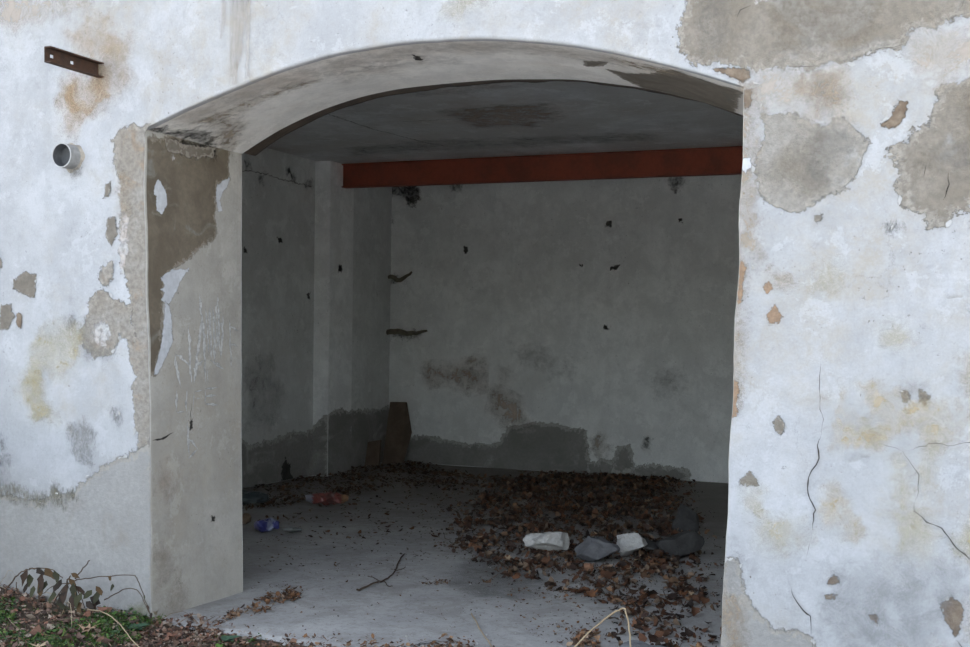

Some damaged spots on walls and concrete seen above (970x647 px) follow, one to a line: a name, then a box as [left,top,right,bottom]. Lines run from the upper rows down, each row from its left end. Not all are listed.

spalling [583,0,970,251]
peeling [0,121,243,619]
peeling [737,261,755,304]
crack [807,367,824,553]
crack [882,442,970,559]
peeling [721,557,816,647]